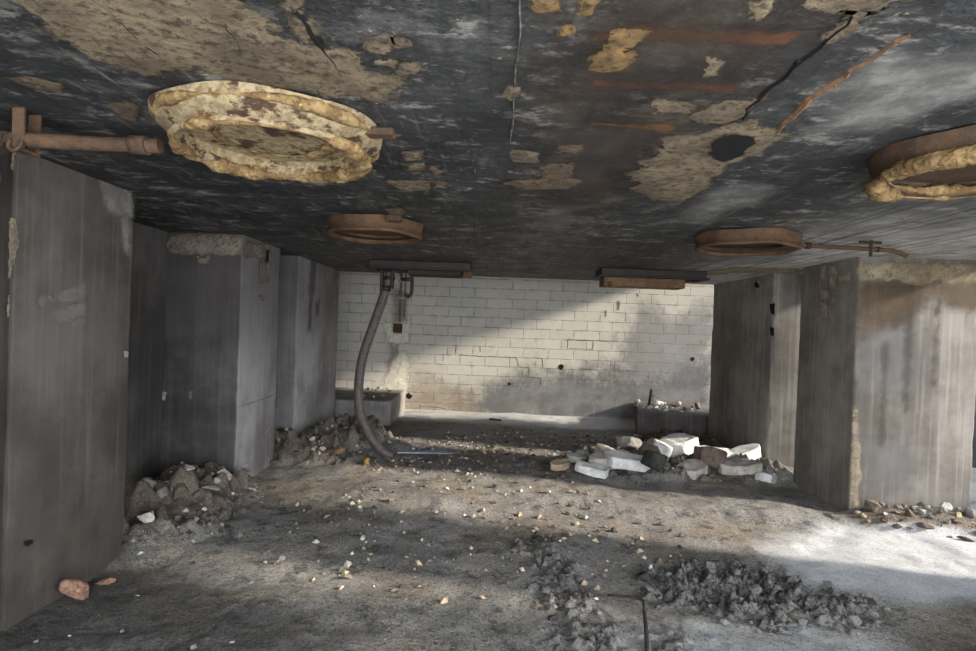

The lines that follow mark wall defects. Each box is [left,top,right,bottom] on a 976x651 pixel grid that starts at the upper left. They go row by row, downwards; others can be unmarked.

peeling [3,0,425,105]
peeling [586,27,655,74]
rust [548,1,797,203]
peeling [625,96,797,203]
crack [742,16,852,121]
crack [775,33,913,135]
peeling [167,233,271,300]
peeling [855,259,976,285]